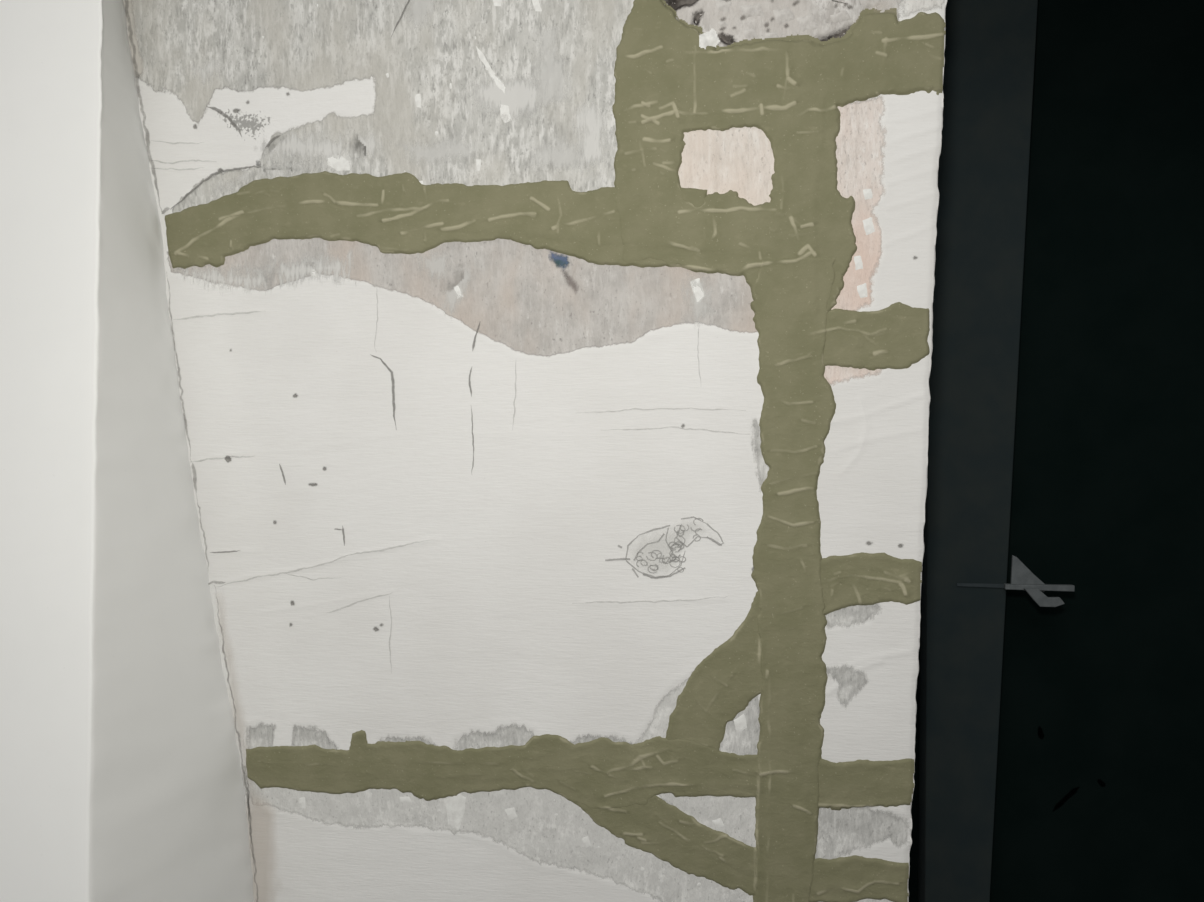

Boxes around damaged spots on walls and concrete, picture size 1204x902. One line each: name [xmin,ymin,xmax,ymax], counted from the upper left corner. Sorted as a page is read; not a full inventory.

spalling [664,0,945,49]
peeling [123,0,634,213]
peeling [678,127,775,206]
peeling [831,97,886,311]
peeling [168,238,758,356]
peeling [249,723,275,749]
peeling [292,726,337,749]
peeling [456,725,534,750]
peeling [242,766,756,902]
peeling [815,806,909,859]